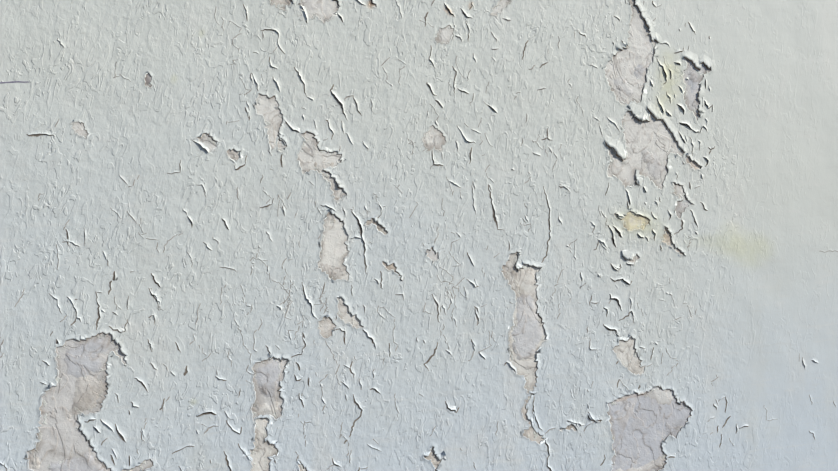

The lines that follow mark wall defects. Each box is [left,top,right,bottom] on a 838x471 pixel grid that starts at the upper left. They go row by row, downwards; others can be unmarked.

crack [26,119,60,138]
crack [214,4,375,152]
peeling [252,90,368,342]
crack [395,0,715,375]
peeling [602,0,705,259]
peeling [22,328,157,471]
crack [40,144,406,471]
peeling [242,352,293,471]
peeling [498,248,550,447]
crack [531,382,600,471]
peeling [558,332,696,471]
crack [708,375,777,447]